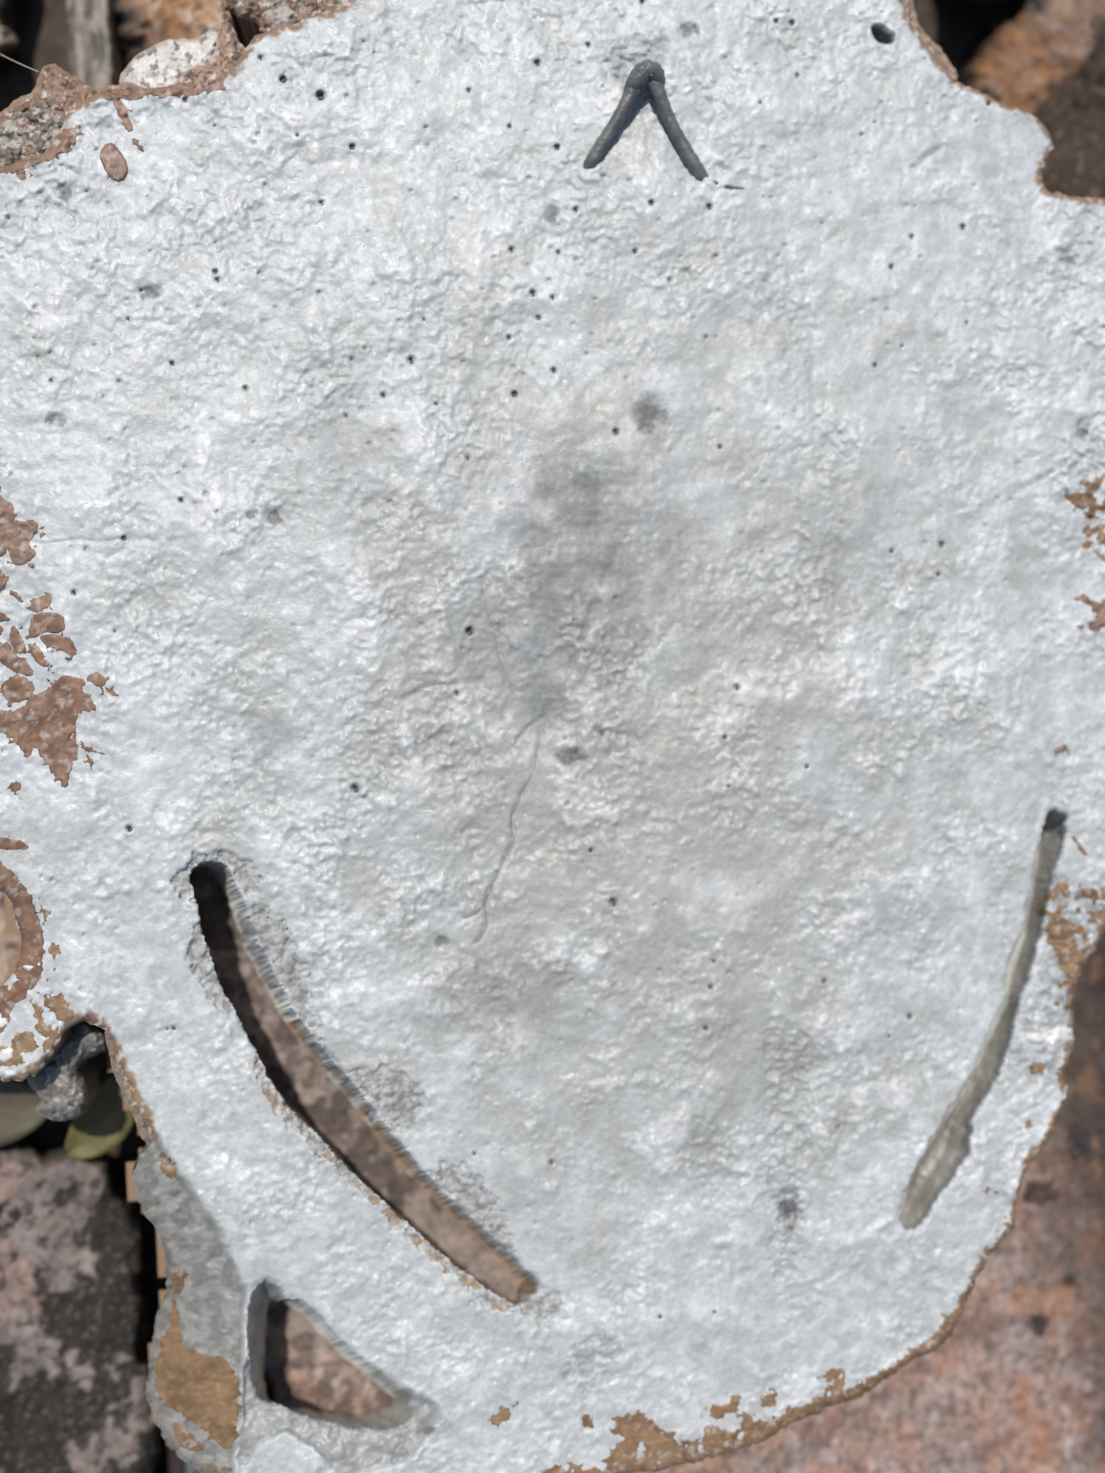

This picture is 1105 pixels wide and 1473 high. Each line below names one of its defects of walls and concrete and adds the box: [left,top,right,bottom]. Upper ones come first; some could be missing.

peeling [0,486,119,788]
peeling [1064,476,1105,562]
peeling [1072,594,1105,632]
peeling [7,781,21,795]
crack [464,625,585,944]
peeling [0,837,75,1067]
peeling [1025,879,1105,1133]
peeling [159,1152,177,1179]
peeling [146,1269,242,1473]
peeling [488,1401,518,1429]
peeling [541,1193,1019,1473]